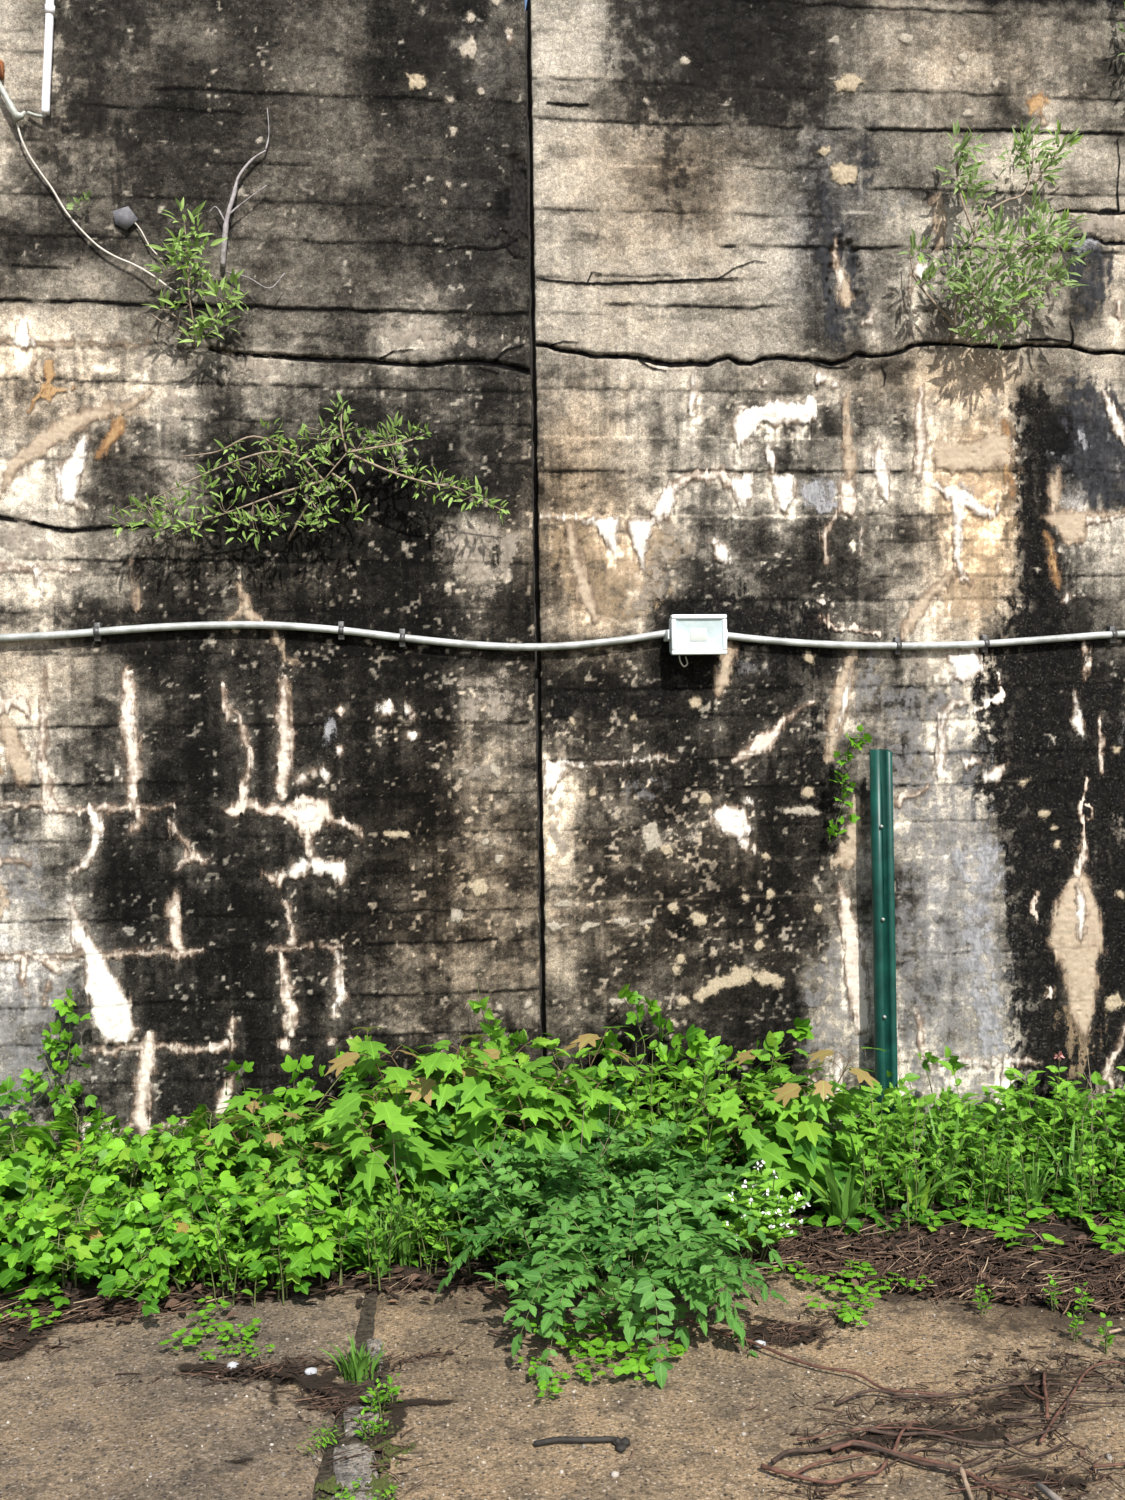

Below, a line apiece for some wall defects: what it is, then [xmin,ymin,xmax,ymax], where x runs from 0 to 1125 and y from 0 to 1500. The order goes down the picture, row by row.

damp [17,0,163,232]
damp [396,0,469,93]
damp [604,0,885,352]
crack [1050,139,1125,264]
crack [209,320,1125,385]
damp [540,367,891,788]
damp [220,570,364,1053]
damp [543,751,675,861]
damp [641,797,757,856]
damp [830,794,871,1034]
damp [893,370,1125,1138]
damp [807,1056,844,1096]